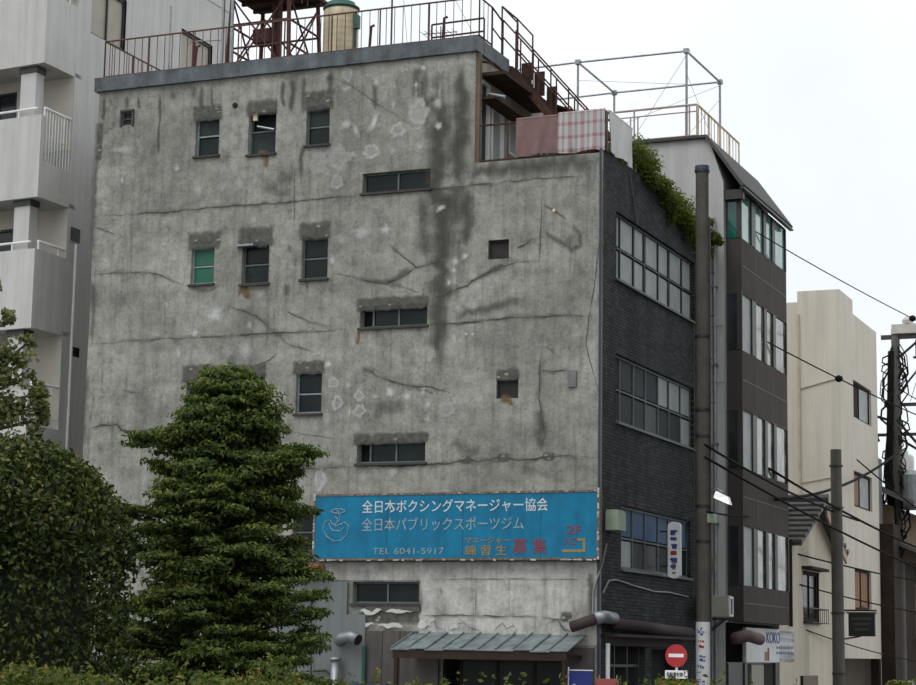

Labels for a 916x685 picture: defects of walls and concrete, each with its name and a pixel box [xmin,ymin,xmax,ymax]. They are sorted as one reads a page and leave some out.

crack [98,164,351,232]
water stain [428,76,469,352]
crack [340,176,574,297]
crack [95,307,352,370]
crack [430,247,599,388]
crack [90,400,142,432]
crack [305,346,586,469]